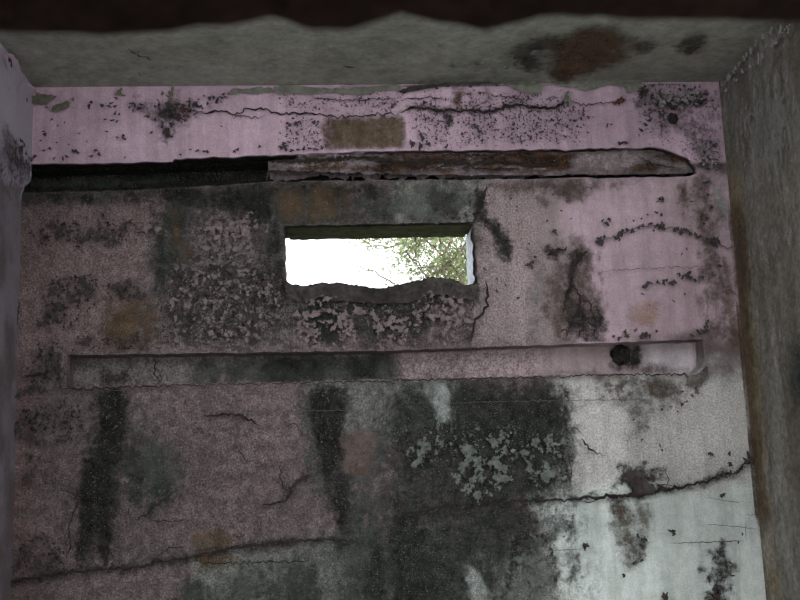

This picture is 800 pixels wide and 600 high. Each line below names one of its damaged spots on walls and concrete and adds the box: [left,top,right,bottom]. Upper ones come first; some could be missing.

damp [322,116,405,149]
crack [191,94,613,119]
rust [294,149,573,174]
peeling [87,24,790,175]
rust [530,25,633,83]
peeling [595,181,721,249]
spalling [14,211,479,450]
damp [76,368,140,566]
crack [11,463,354,587]
damp [265,357,575,600]
peeling [405,422,575,548]
crack [398,427,757,544]